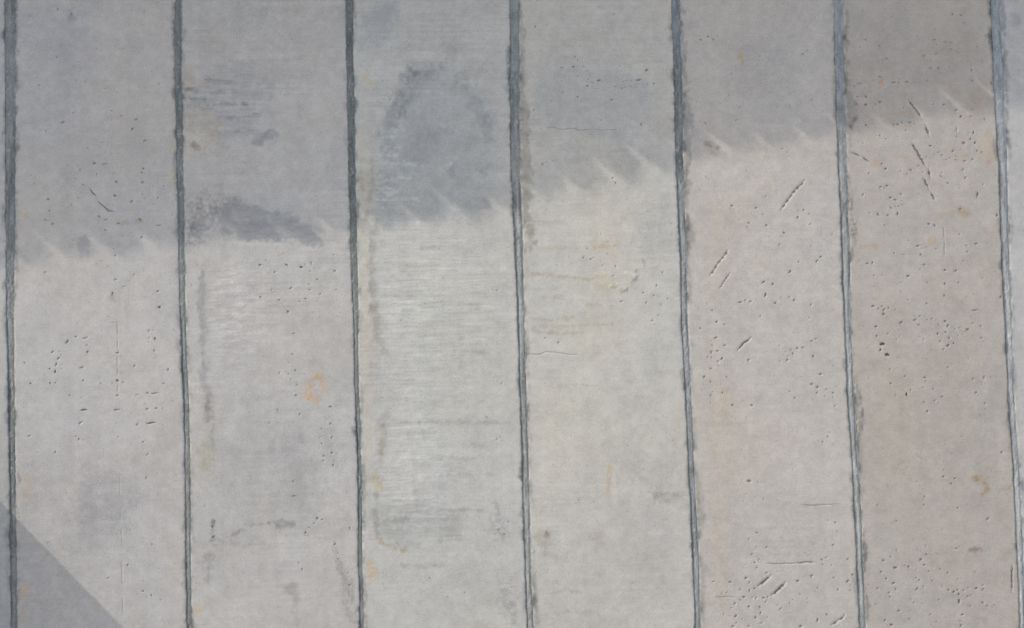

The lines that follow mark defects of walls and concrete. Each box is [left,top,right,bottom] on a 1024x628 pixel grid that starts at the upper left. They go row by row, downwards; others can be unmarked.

water stain [17,0,115,89]
water stain [353,0,405,56]
water stain [708,15,831,144]
water stain [182,30,688,587]